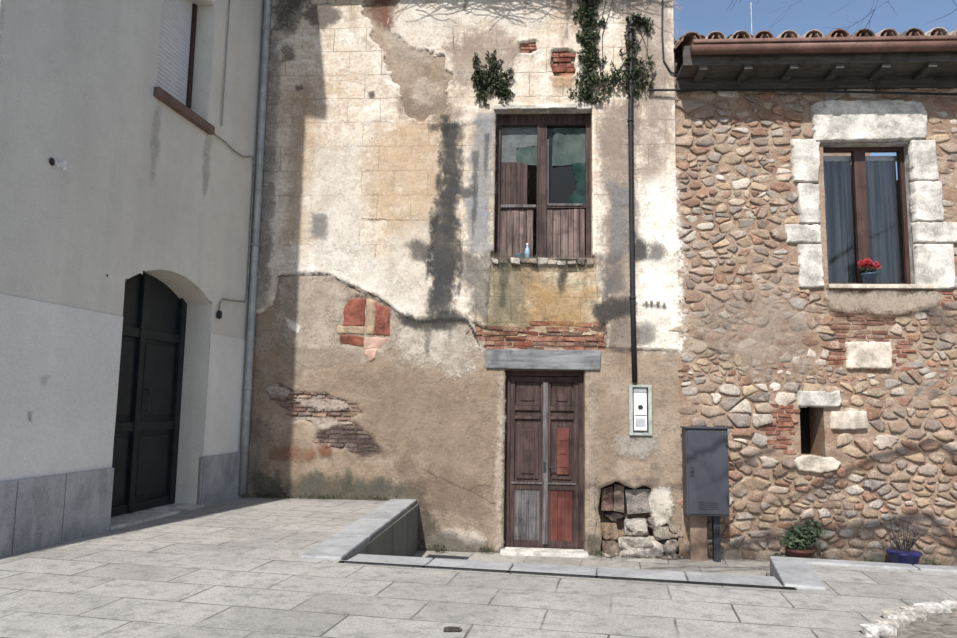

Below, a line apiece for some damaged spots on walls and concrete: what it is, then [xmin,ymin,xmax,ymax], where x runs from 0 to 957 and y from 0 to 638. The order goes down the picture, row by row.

flaking render [445,30,537,85]
spalling [475,0,675,352]
leakage [397,112,495,351]
leakage [592,221,664,344]
flaking render [286,318,301,333]
spalling [337,297,391,362]
spalling [265,383,378,457]